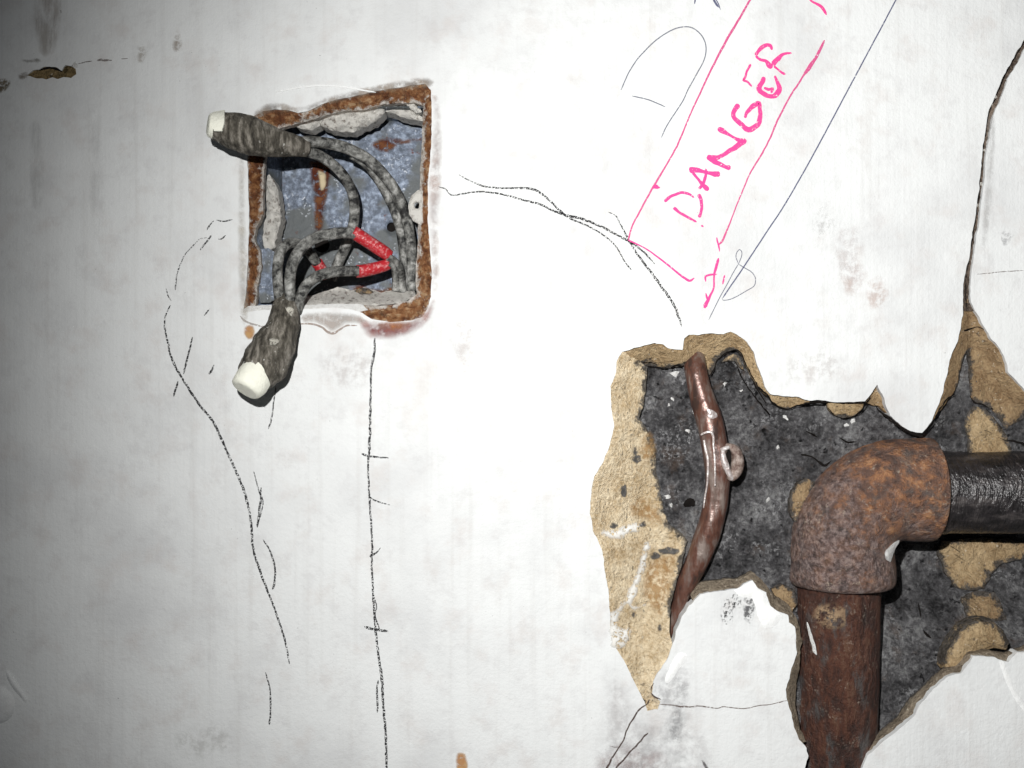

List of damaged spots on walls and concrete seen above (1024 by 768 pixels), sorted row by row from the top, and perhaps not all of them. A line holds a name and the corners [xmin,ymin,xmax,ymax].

spalling [28,62,78,79]
crack [963,41,1024,311]
spalling [590,299,1024,751]